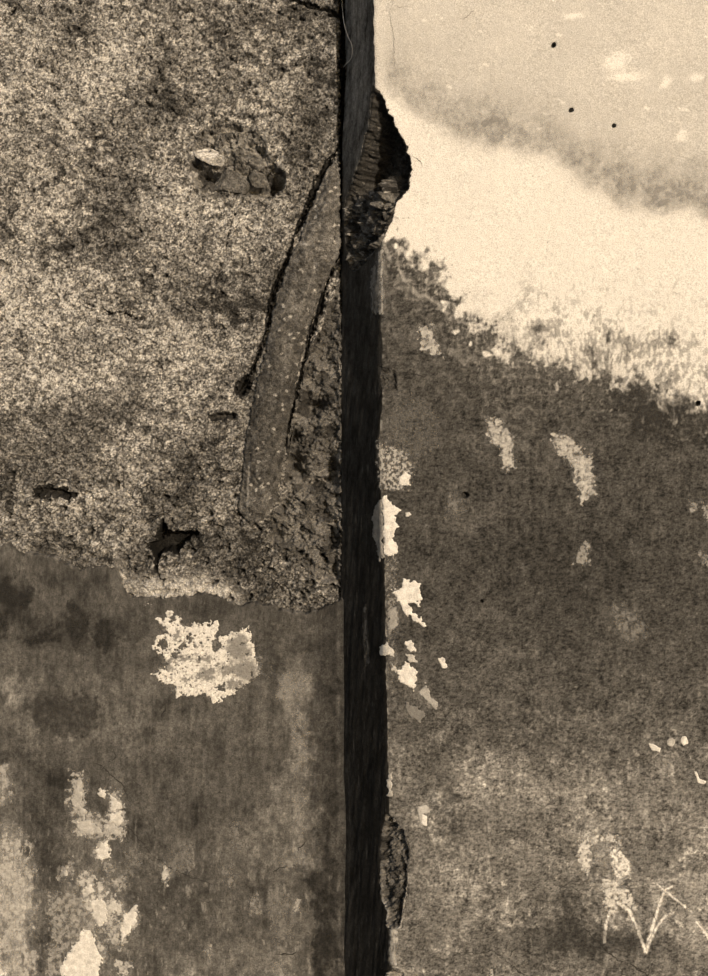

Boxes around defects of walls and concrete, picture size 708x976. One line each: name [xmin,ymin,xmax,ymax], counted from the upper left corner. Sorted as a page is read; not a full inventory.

spalling [187,119,289,200]
crack [243,0,347,448]
spalling [343,86,412,315]
water stain [468,116,508,142]
water stain [573,157,708,206]
crack [81,301,143,320]
peeling [362,367,439,723]
water stain [24,603,120,650]
peeling [150,610,269,704]
water stain [30,688,101,739]
peeling [0,764,143,976]
spalling [379,814,424,976]